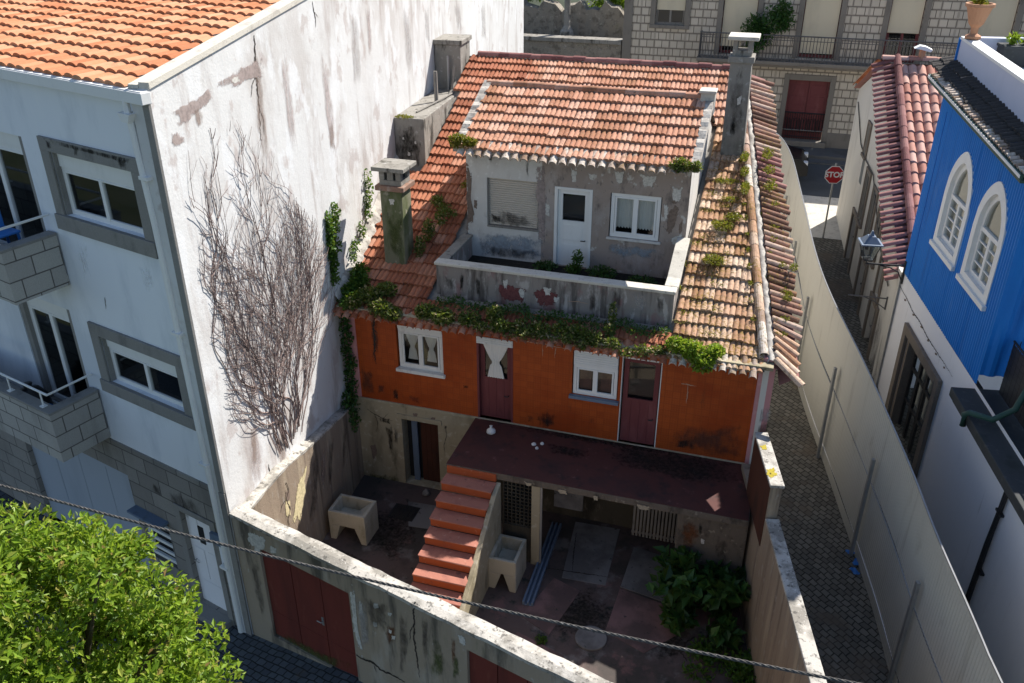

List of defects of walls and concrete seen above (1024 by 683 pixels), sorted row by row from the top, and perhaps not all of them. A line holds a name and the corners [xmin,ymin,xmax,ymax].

peeling [172,90,211,145]
peeling [220,59,262,86]
crack [251,38,267,139]
peeling [664,184,683,245]
peeling [498,280,559,306]
crack [356,602,420,682]